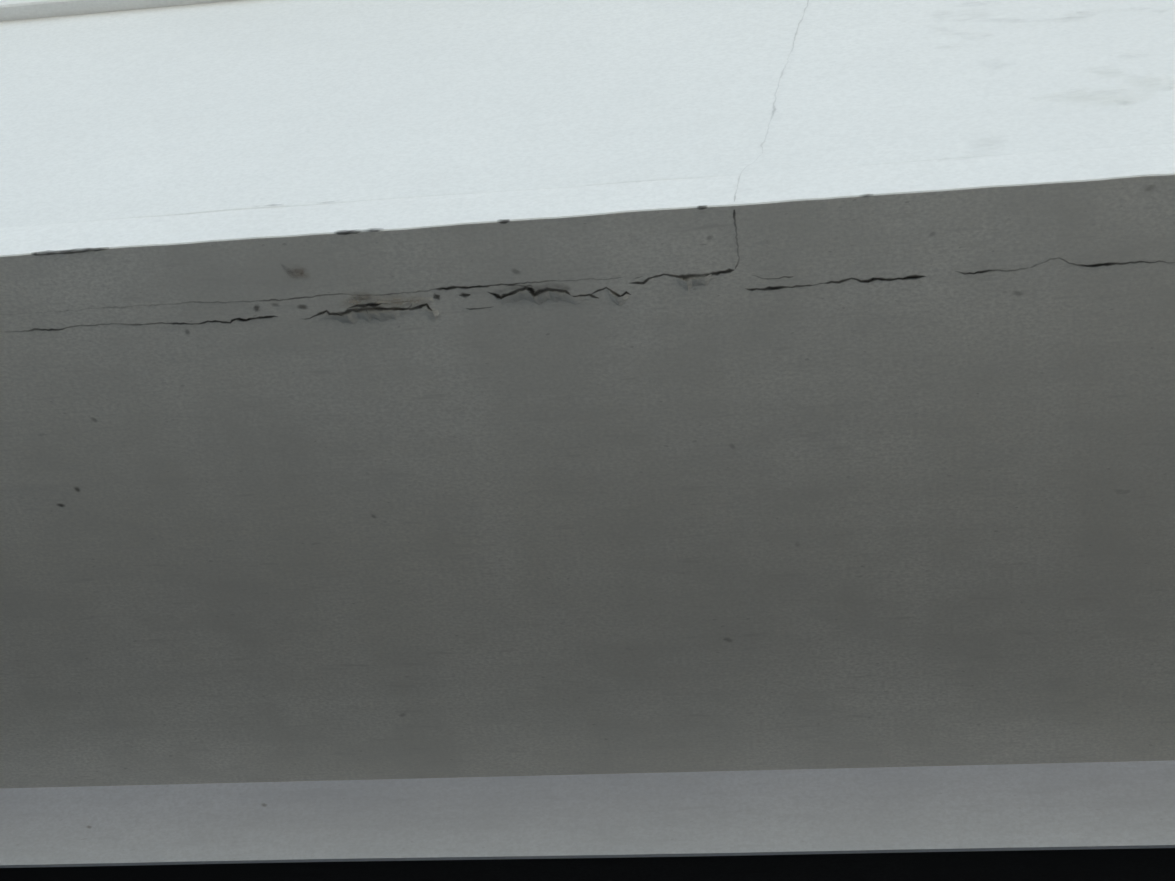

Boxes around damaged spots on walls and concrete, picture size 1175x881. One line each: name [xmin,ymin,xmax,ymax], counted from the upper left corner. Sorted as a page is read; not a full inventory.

crack [1079,260,1160,268]
crack [437,282,518,290]
crack [632,268,926,291]
crack [164,297,303,324]